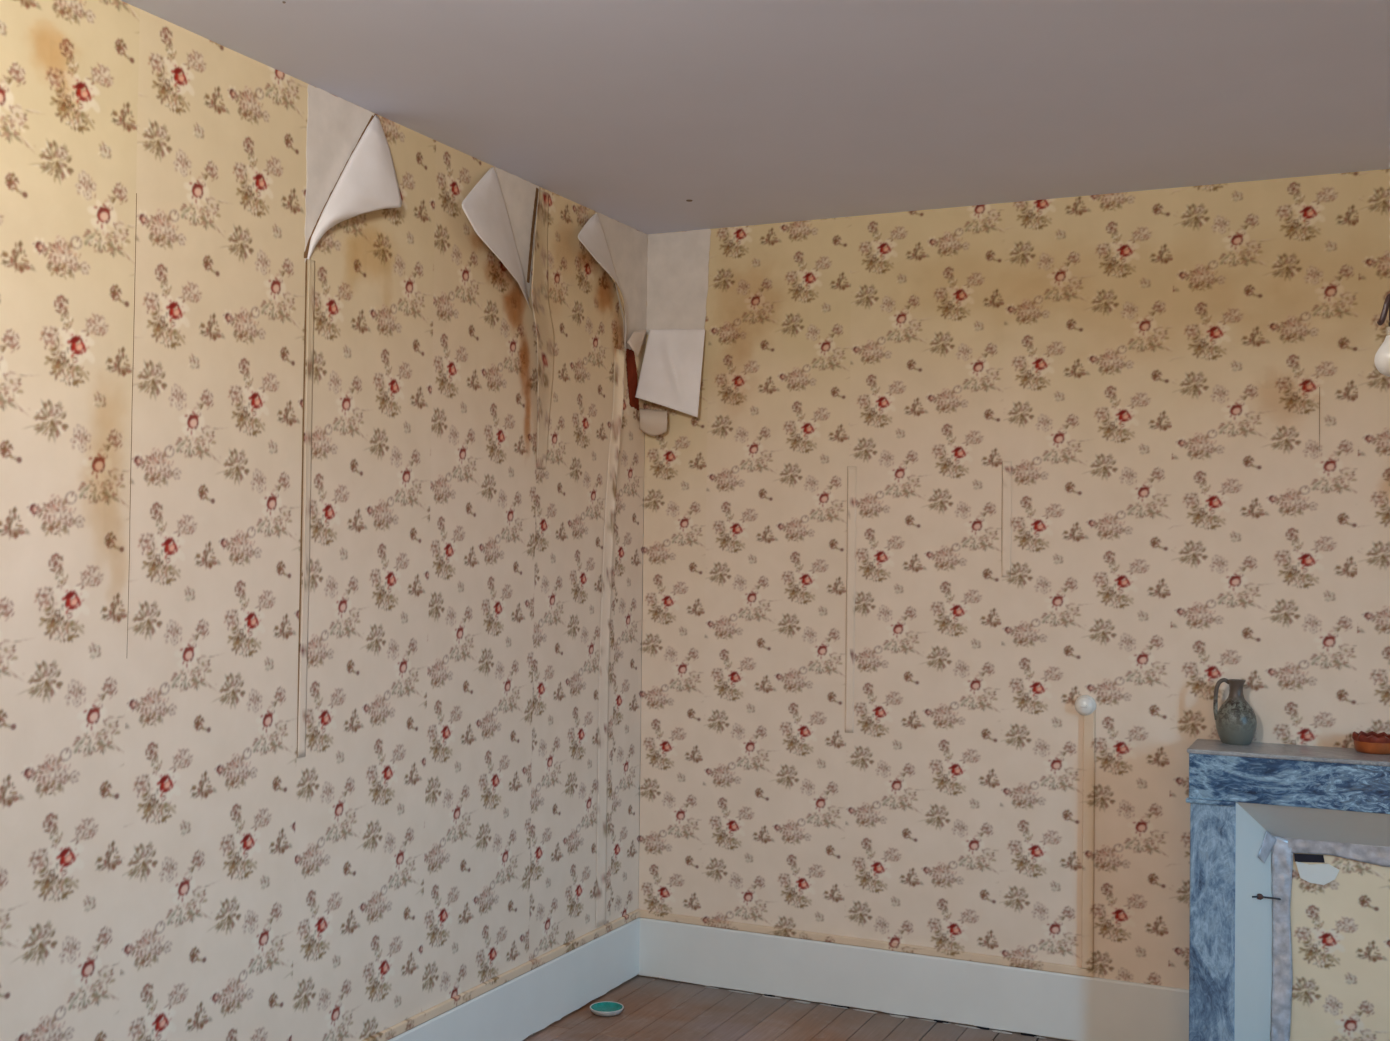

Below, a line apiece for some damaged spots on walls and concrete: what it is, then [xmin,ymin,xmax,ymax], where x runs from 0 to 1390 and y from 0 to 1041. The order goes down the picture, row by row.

flaking render [304,84,374,262]
flaking render [494,166,540,298]
flaking render [595,212,711,351]